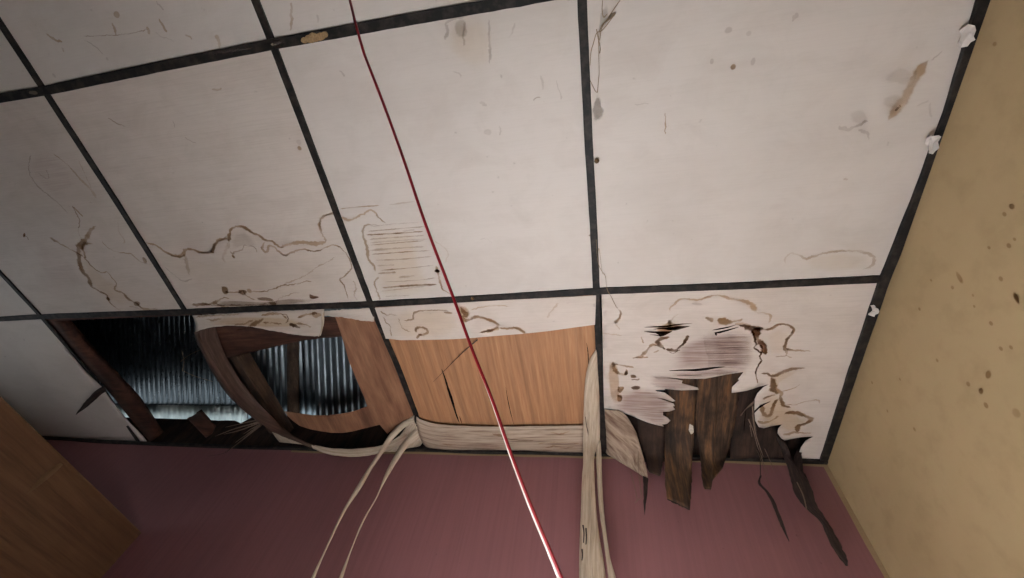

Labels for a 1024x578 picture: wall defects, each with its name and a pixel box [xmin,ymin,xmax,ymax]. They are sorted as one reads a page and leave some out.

water stain [167,226,279,258]
peeling [192,308,408,457]
crack [442,370,462,423]
water stain [718,318,809,431]
peeling [605,409,648,515]